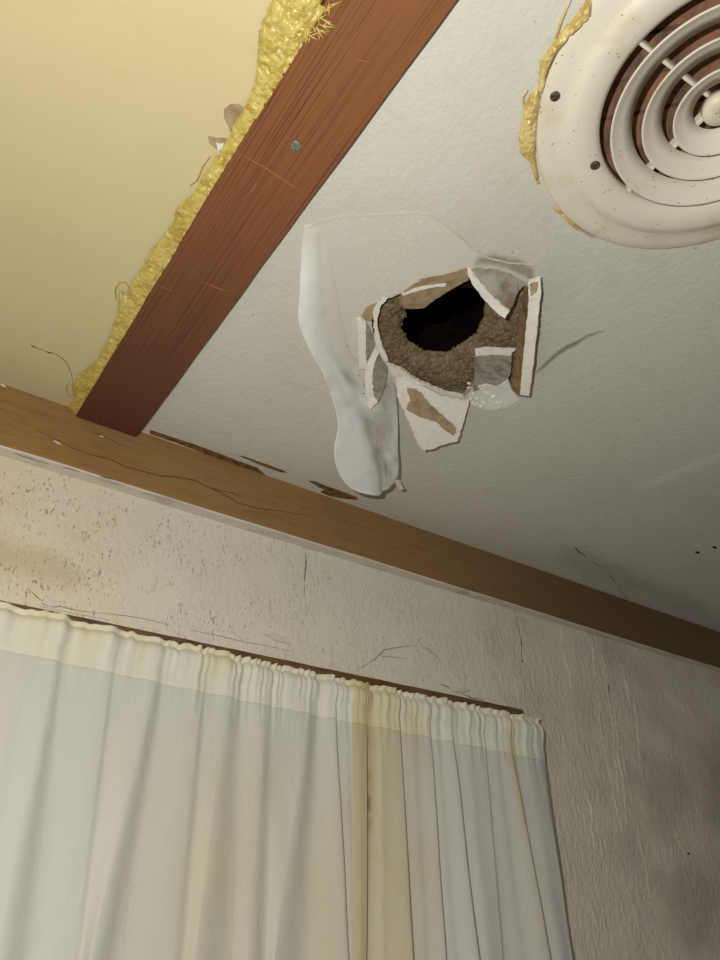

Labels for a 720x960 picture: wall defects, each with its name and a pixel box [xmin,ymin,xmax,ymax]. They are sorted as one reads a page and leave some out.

peeling [298,212,532,500]
crack [14,431,309,516]
peeling [150,430,287,475]
crack [358,637,440,669]